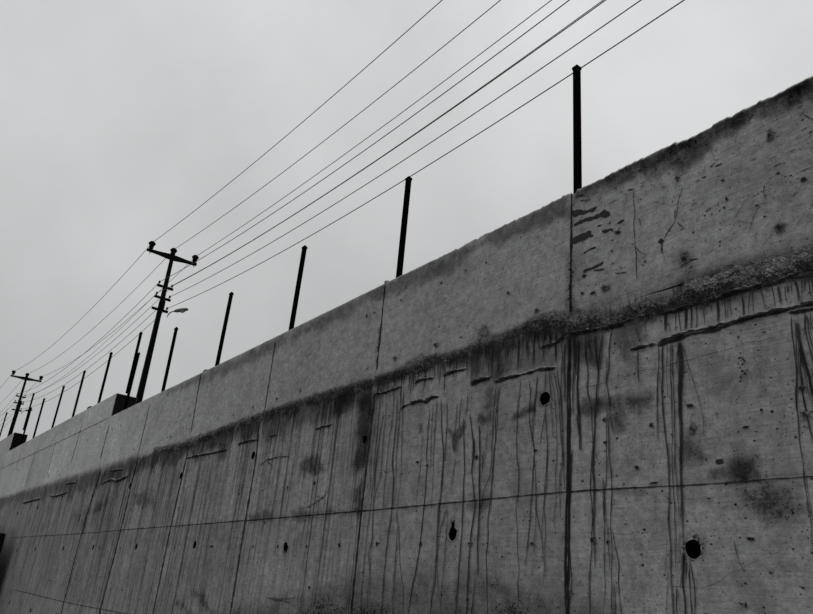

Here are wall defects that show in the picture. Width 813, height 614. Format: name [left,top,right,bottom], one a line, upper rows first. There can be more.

crack [632,189,685,278]
damp [11,324,639,614]
damp [627,275,813,614]